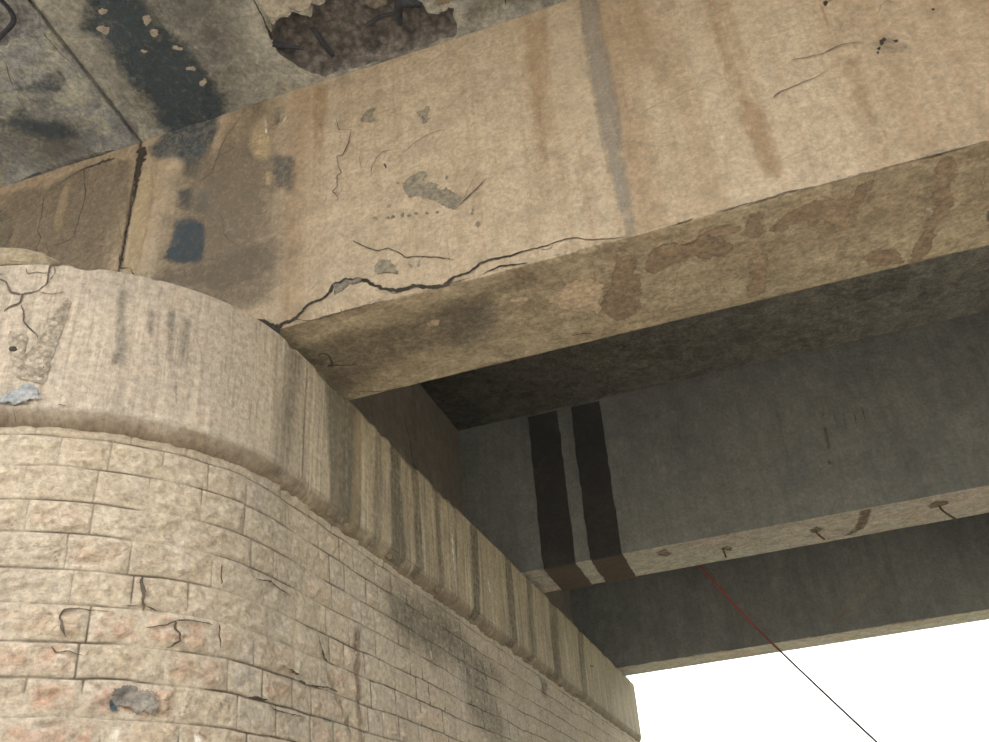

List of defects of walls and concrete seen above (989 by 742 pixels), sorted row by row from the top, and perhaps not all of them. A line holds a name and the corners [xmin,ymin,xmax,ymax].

spalling [257,0,457,77]
damp [85,0,278,304]
damp [583,0,632,233]
peeling [374,171,462,221]
crack [0,158,134,337]
crack [258,237,619,334]
crack [51,608,100,655]
crack [127,576,221,648]
spalling [109,684,160,715]